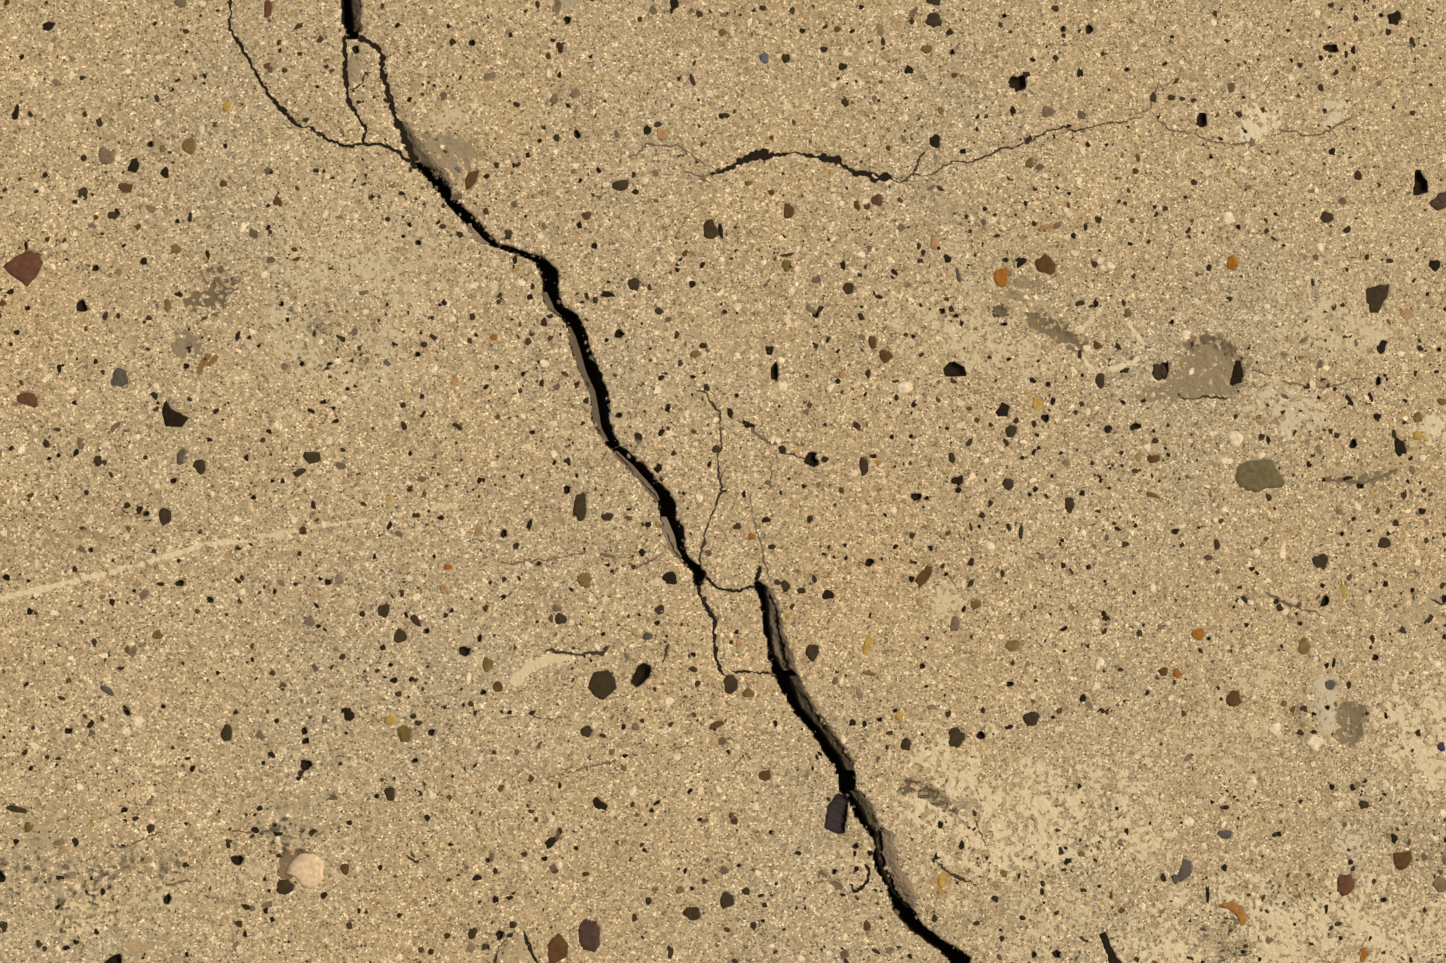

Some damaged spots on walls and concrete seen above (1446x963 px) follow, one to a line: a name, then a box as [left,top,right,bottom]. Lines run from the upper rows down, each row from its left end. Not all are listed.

crack [228,0,973,963]